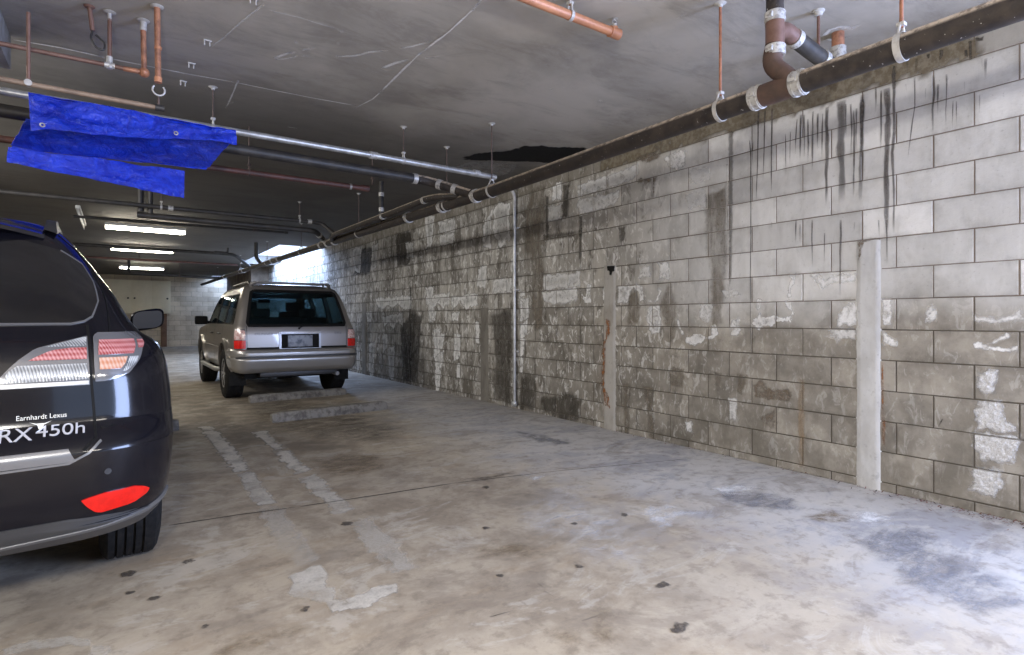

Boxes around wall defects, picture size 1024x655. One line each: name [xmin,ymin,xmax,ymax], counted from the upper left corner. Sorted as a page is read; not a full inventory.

crack [16,0,482,106]
spalling [452,145,586,178]
leakage [353,37,986,420]
rust [601,319,610,407]